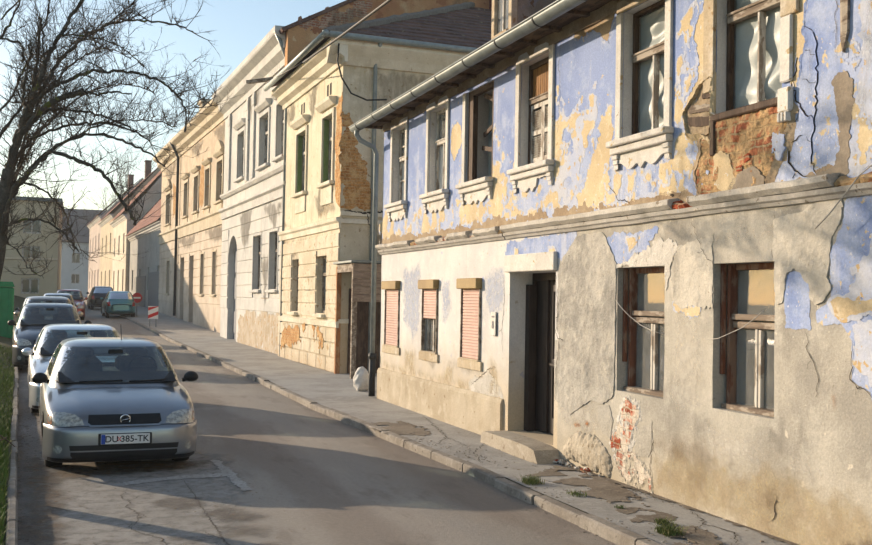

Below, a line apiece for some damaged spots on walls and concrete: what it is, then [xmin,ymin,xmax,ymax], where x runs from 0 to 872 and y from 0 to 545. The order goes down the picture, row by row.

spalling [335,92,371,211]
spalling [379,0,835,244]
crack [787,1,838,179]
peeling [833,34,862,71]
peeling [850,98,872,171]
peeling [625,234,638,254]
peeling [816,195,872,399]
spalling [609,396,654,494]